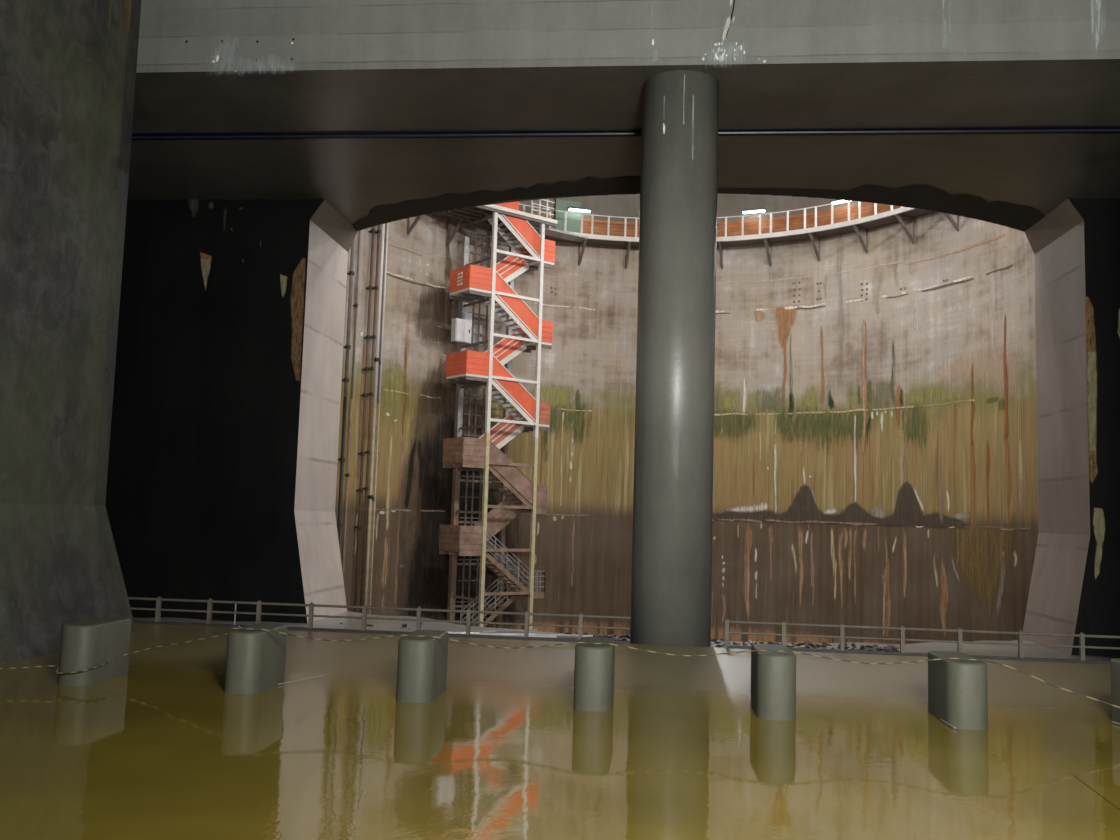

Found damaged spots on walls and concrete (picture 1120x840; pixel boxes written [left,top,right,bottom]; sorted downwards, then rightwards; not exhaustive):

crack [722,0,735,41]
damp [418,228,459,344]
corrosion [756,308,796,409]
damp [376,363,537,621]
damp [553,412,575,586]